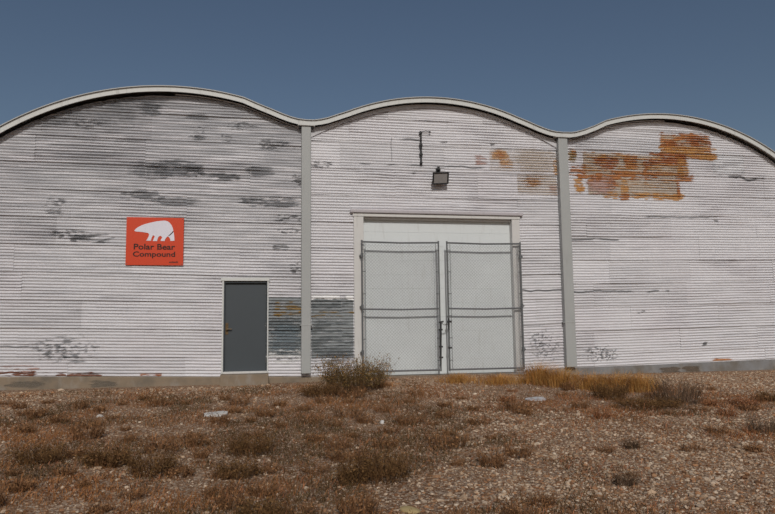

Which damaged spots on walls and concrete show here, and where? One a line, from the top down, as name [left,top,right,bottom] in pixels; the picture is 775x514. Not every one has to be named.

peeling [121,190,196,205]
corrosion [475,150,558,195]
corrosion [568,132,717,201]
peeling [265,297,301,364]
peeling [311,295,354,363]